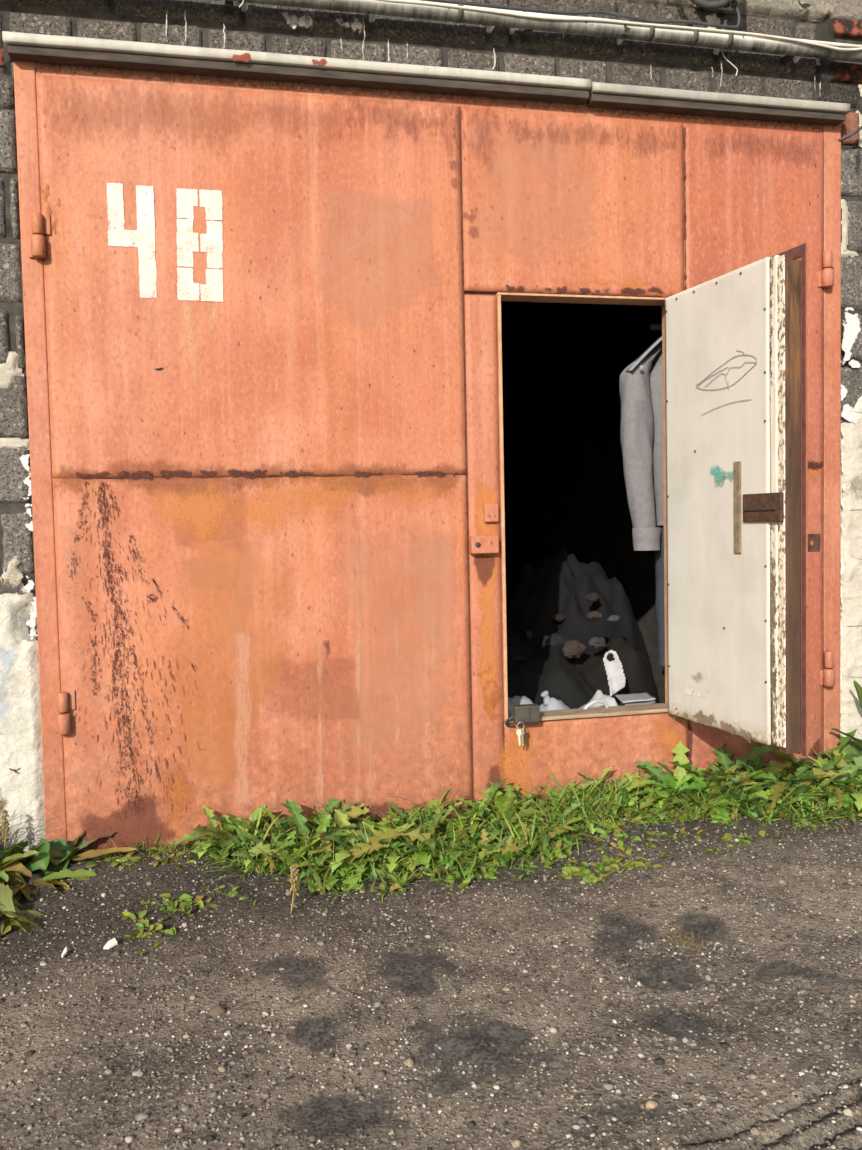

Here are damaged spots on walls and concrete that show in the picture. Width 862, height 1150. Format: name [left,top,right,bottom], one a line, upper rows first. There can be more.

corrosion [545,286,663,294]
peeling [841,307,861,368]
peeling [19,454,33,531]
peeling [841,385,860,530]
peeling [0,556,37,640]
corrosion [61,461,457,820]